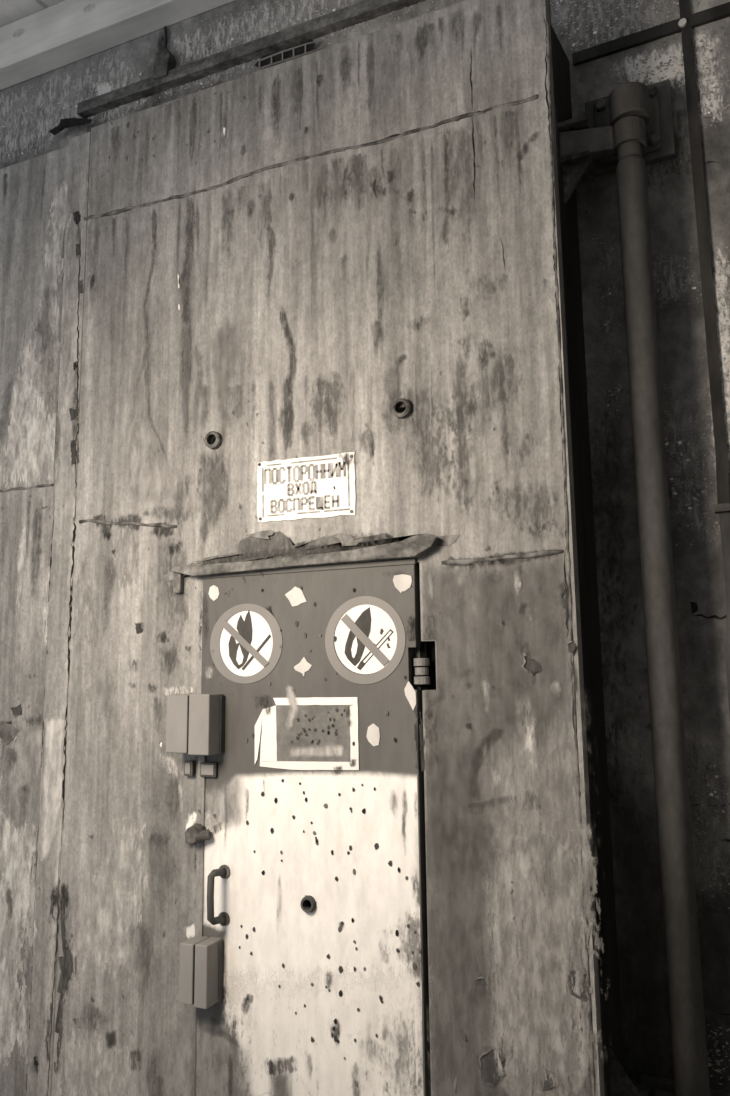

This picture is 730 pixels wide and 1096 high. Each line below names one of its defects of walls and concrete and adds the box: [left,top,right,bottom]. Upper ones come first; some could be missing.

rust [373,171,424,224]
rust [280,312,338,442]
rust [385,344,514,506]
rust [504,486,556,536]
rust [33,884,76,1072]
peeling [474,708,600,1096]